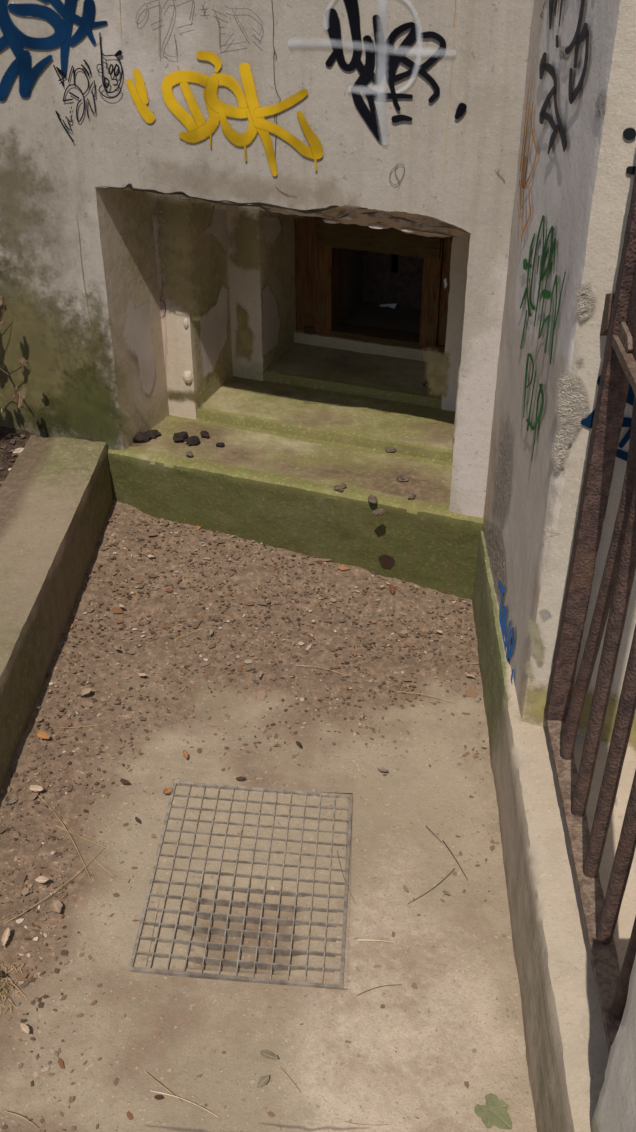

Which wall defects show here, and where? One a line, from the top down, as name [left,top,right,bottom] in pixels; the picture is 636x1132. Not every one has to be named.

damp [0,143,48,270]
spalling [116,187,471,379]
spalling [551,359,589,471]